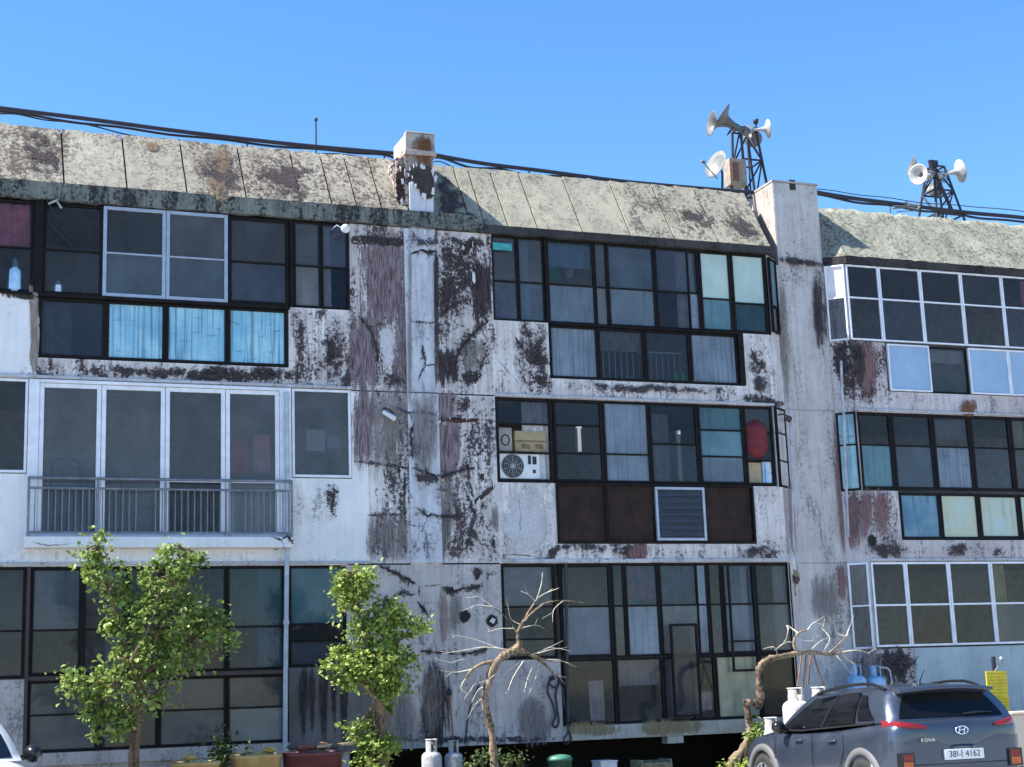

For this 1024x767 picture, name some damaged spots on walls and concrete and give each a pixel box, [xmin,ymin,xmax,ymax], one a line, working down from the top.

water stain [193,154,319,201]
rust [412,135,435,165]
mould [59,364,305,382]
water stain [297,176,494,562]
mould [520,315,553,389]
water stain [779,257,878,397]
rust [961,400,977,418]
water stain [384,661,563,749]